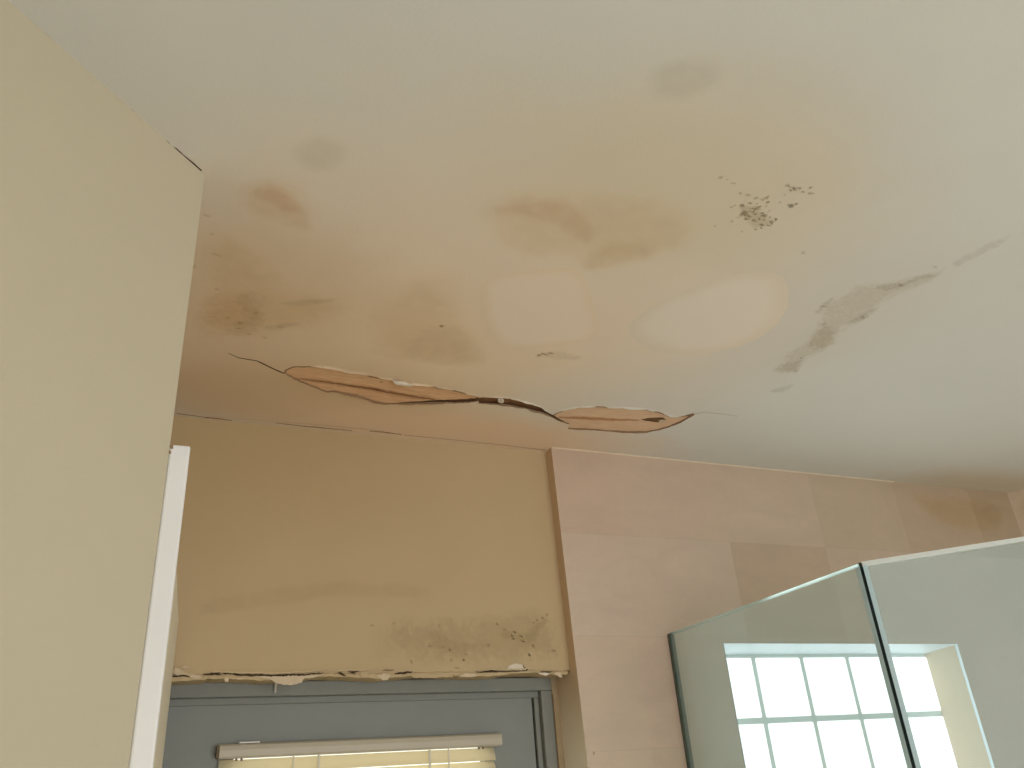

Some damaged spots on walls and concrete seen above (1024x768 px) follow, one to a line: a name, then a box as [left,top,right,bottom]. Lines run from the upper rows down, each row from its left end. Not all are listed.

crack [229,353,283,373]
peeling [281,365,481,406]
crack [400,396,568,426]
peeling [553,405,696,434]
peeling [171,663,569,686]